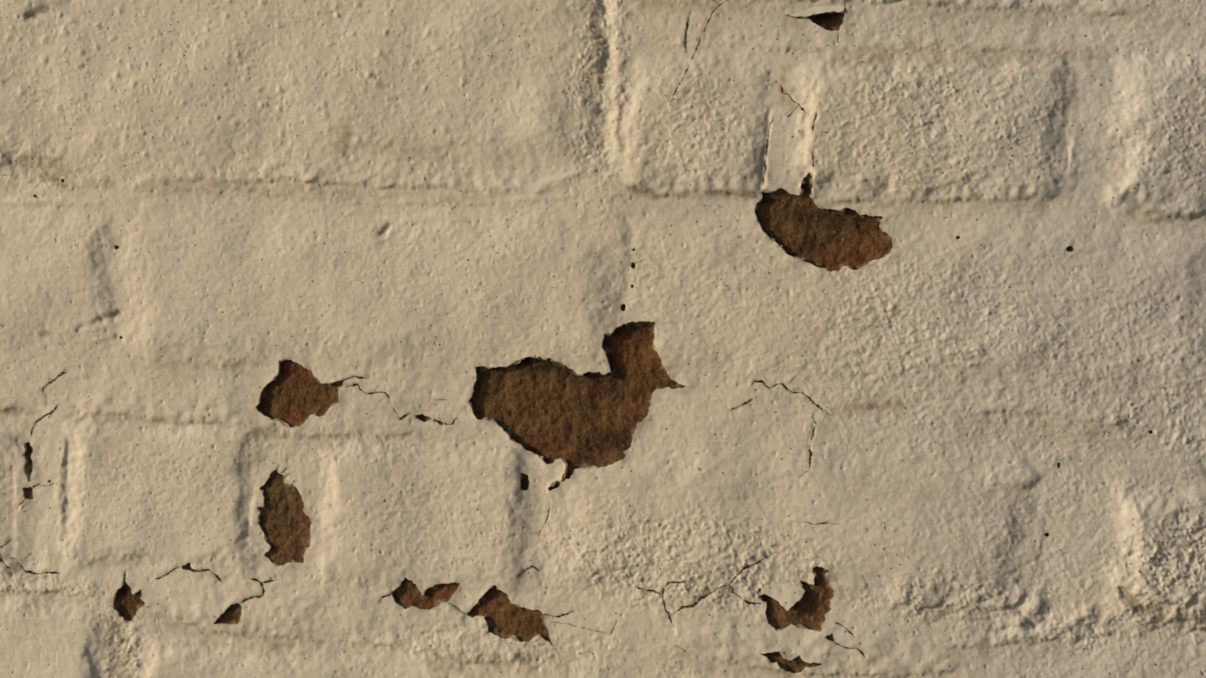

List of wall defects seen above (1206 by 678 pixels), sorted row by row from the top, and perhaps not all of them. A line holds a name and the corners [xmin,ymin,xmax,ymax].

crack [763,85,817,184]
peeling [755,172,893,272]
crack [30,372,67,436]
peeling [256,359,345,428]
crack [339,376,410,420]
peeling [469,321,686,491]
crack [731,380,830,476]
peeling [257,469,312,567]
crack [241,578,275,603]
peeling [467,585,552,645]
crack [636,552,775,652]
peeling [757,566,835,642]